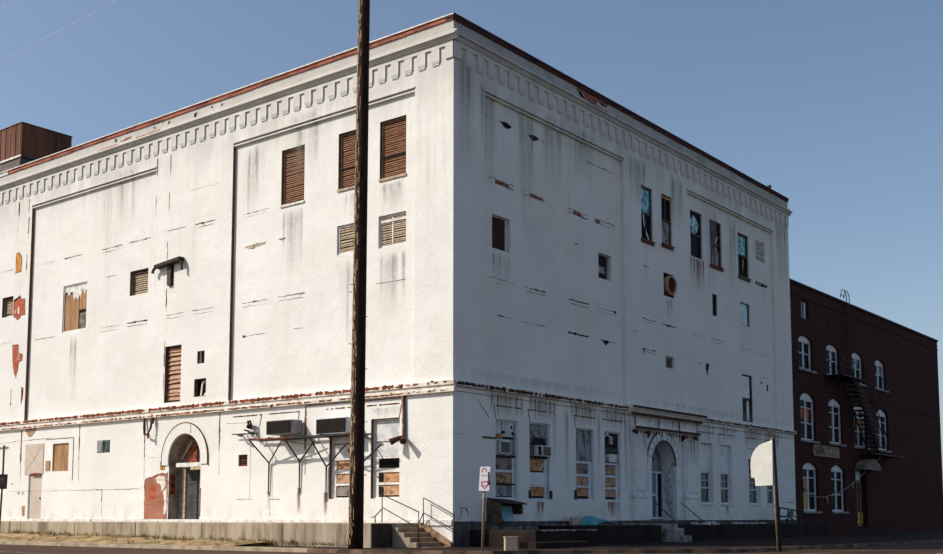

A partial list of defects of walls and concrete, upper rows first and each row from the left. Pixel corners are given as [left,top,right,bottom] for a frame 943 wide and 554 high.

spalling [489,176,545,202]
peeling [144,462,168,519]